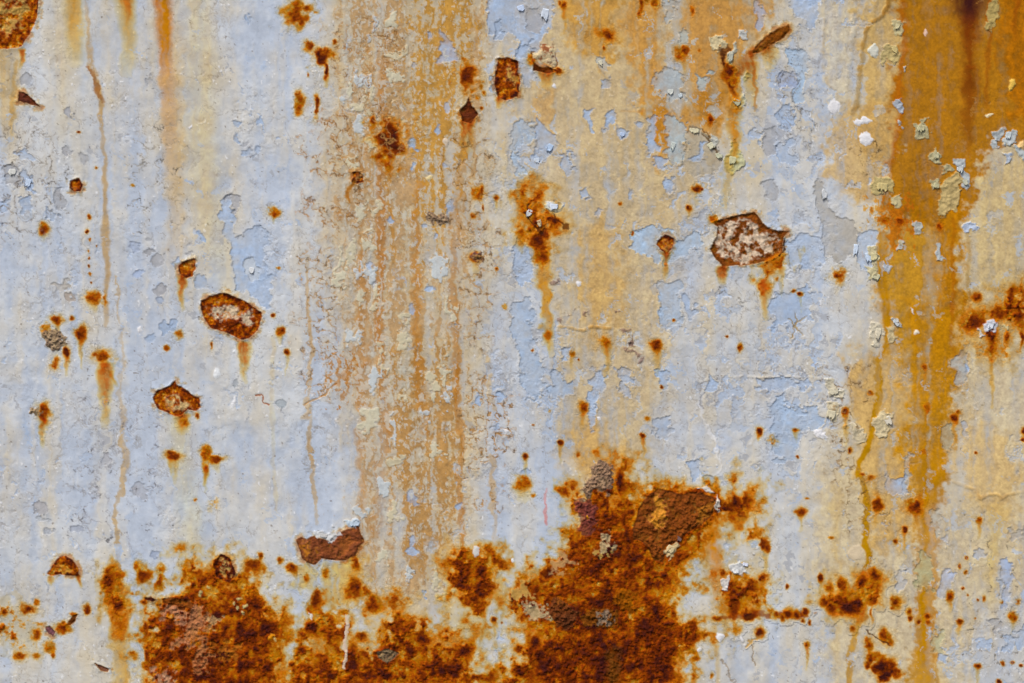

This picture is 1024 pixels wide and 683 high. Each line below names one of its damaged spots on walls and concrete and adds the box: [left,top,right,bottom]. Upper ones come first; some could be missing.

peeling [484,0,569,109]
peeling [505,116,578,178]
peeling [582,65,737,198]
spalling [628,0,893,334]
peeling [928,152,971,191]
peeling [990,128,1024,166]
peeling [896,220,925,251]
corrosion [35,0,788,683]
corrosion [697,0,1024,683]
peeling [949,349,971,387]
peeling [883,451,916,498]
corrosion [0,590,60,665]